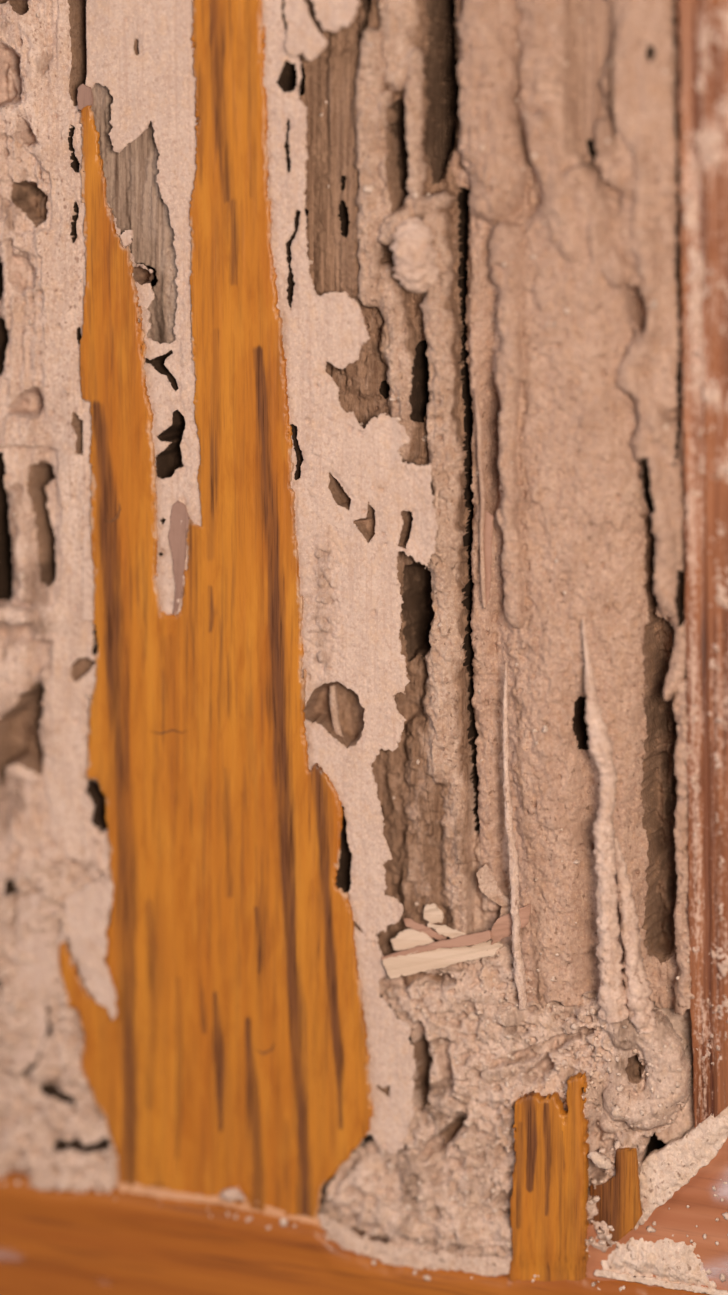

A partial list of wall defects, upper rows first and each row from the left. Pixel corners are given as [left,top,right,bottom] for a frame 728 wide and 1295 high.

peeling [82,399,95,621]
peeling [85,0,202,616]
peeling [261,0,439,1155]
crack [457,187,480,834]
peeling [57,876,117,1021]
peeling [507,1072,643,1282]